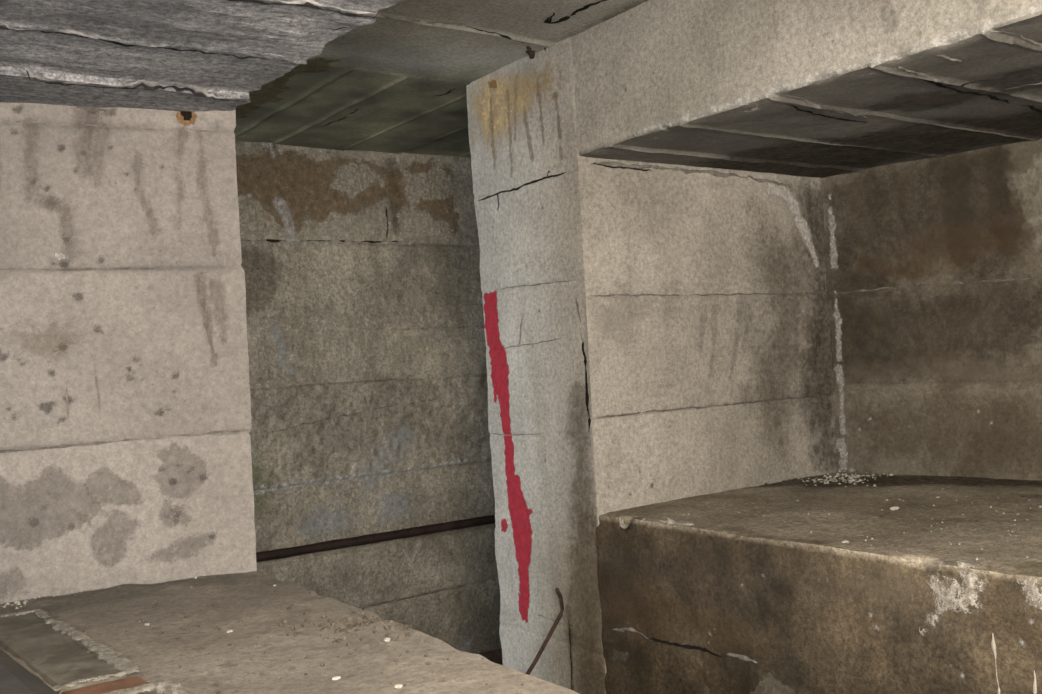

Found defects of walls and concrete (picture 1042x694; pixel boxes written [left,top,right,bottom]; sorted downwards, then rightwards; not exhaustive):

crack [0,22,273,60]
crack [228,0,526,44]
crack [23,66,246,102]
corrosion [176,111,196,126]
water stain [235,58,339,119]
corrosion [473,71,549,145]
crack [478,171,566,208]
water stain [236,142,459,292]
water stain [707,112,1042,487]
spalling [919,557,990,636]
spalling [1016,577,1042,624]
crack [612,627,757,664]